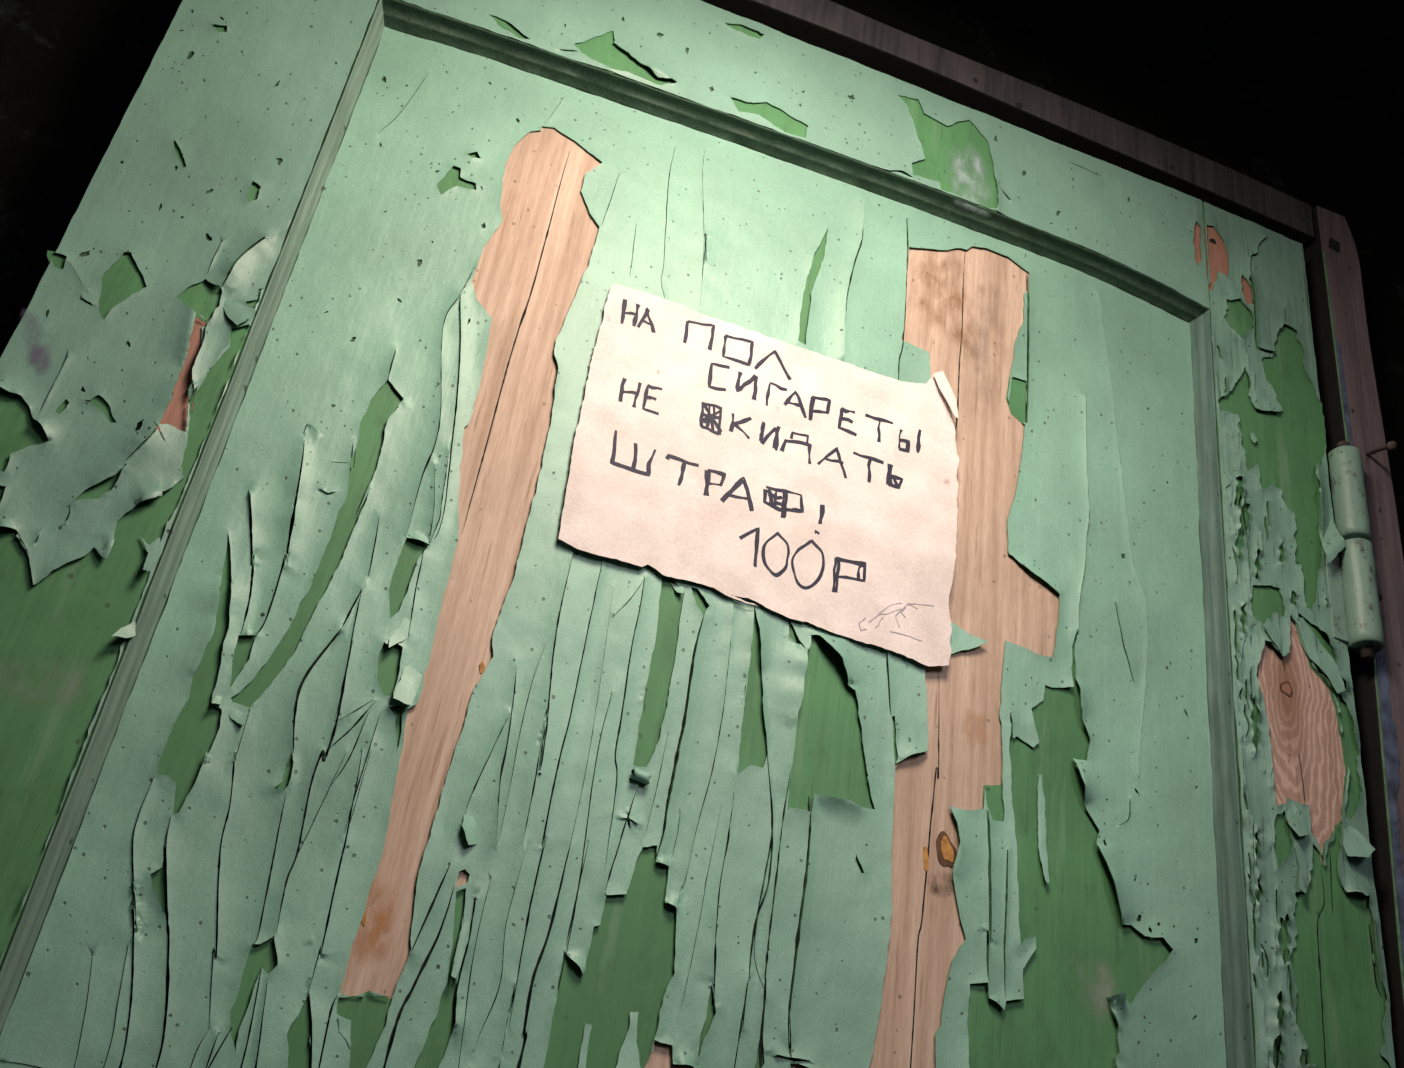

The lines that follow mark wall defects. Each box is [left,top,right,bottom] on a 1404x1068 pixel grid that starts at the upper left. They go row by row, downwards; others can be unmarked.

peeling [575,17,675,90]
peeling [899,96,998,212]
peeling [798,229,828,344]
peeling [0,279,266,967]
peeling [157,381,403,814]
peeling [337,119,602,1068]
peeling [630,576,709,785]
peeling [738,608,768,773]
peeling [784,619,874,816]
peeling [869,247,1174,1068]
peeling [1215,325,1390,1068]
peeling [543,846,716,1068]